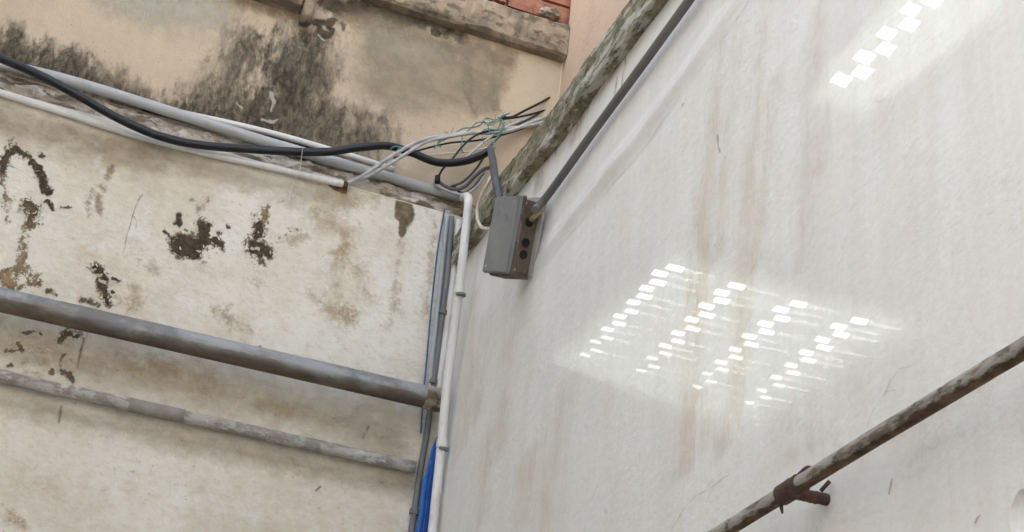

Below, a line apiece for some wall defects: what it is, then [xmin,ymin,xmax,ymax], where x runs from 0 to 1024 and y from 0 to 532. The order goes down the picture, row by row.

leakage [0,23,389,161]
leakage [341,14,514,109]
peeling [0,138,54,212]
peeling [162,211,231,264]
peeling [243,205,275,267]
peeling [78,261,120,309]
peeling [48,327,84,383]